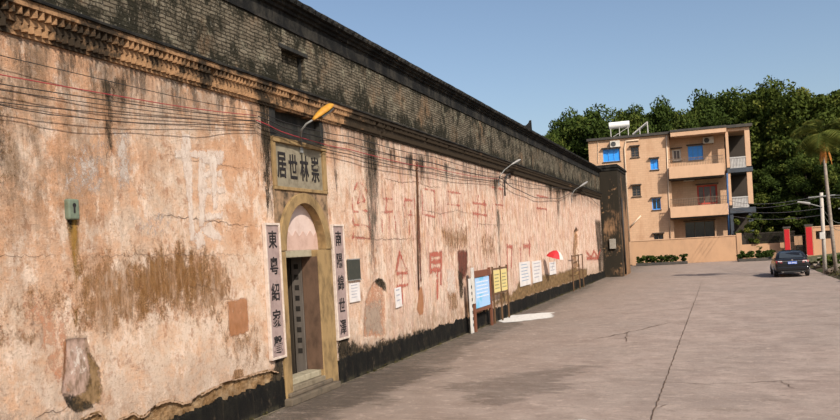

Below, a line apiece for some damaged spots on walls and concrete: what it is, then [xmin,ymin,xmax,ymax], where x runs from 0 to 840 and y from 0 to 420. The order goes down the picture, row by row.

peeling [24,299,107,420]
corrosion [68,220,78,265]
leakage [74,241,231,336]
flaking render [118,369,279,420]
peeling [228,298,249,337]
leakage [363,134,379,259]